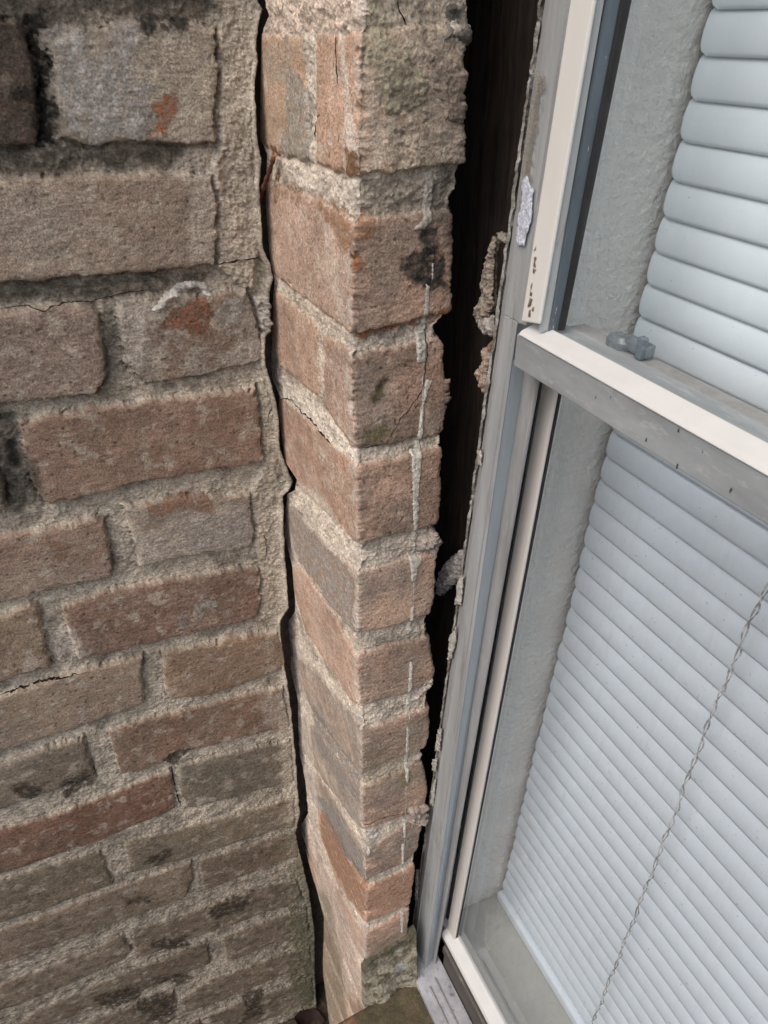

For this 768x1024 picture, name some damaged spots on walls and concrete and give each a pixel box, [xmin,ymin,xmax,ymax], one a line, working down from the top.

rust [150,95,178,135]
water stain [400,228,447,290]
spalling [474,340,493,393]
crack [220,0,336,985]
crack [1,672,87,695]